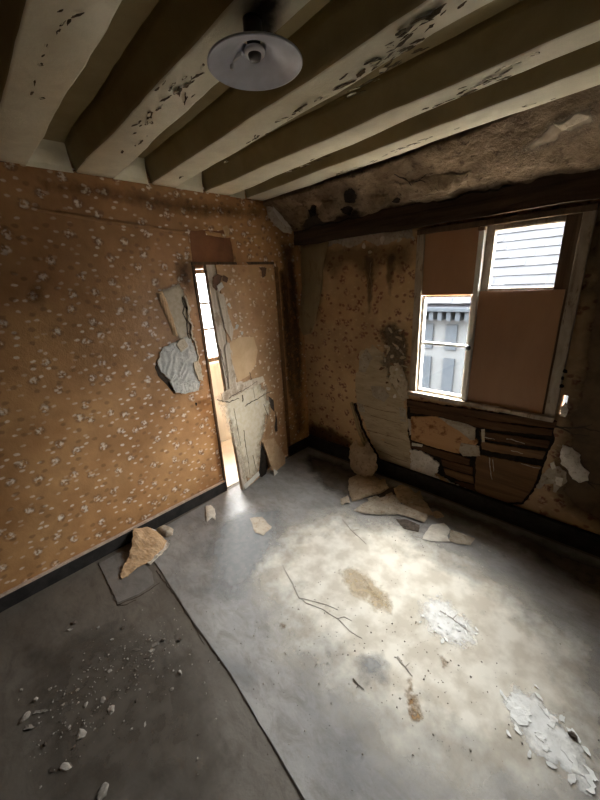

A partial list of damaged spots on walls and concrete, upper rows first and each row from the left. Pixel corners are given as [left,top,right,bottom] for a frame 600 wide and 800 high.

peeling [131,63,205,146]
peeling [333,3,447,98]
peeling [422,62,522,110]
flaking render [524,108,593,151]
leakage [324,247,407,303]
flaking render [155,291,203,394]
leakage [380,324,408,385]
flaking render [375,327,590,505]
crack [283,566,361,638]
leakage [211,510,598,782]
peeling [500,683,599,794]